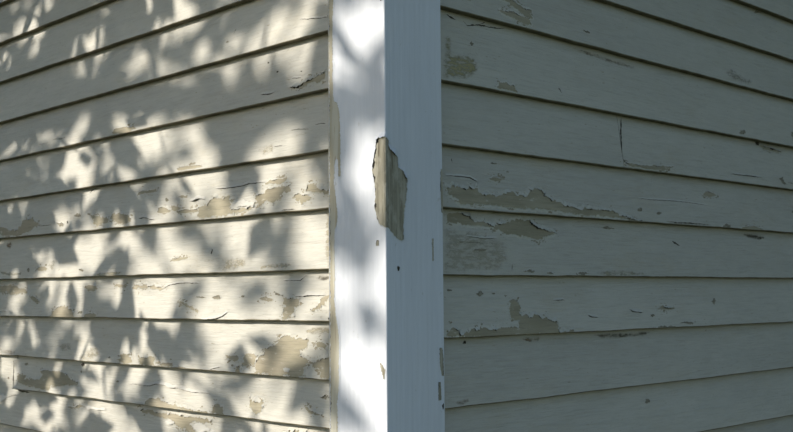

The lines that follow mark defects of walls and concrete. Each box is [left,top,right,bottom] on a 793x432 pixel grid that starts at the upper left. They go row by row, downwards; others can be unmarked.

peeling [56,210,133,228]
peeling [156,0,342,432]
peeling [369,131,410,245]
peeling [440,162,642,245]
peeling [445,296,575,345]
peeling [7,362,85,393]
peeling [138,395,224,432]